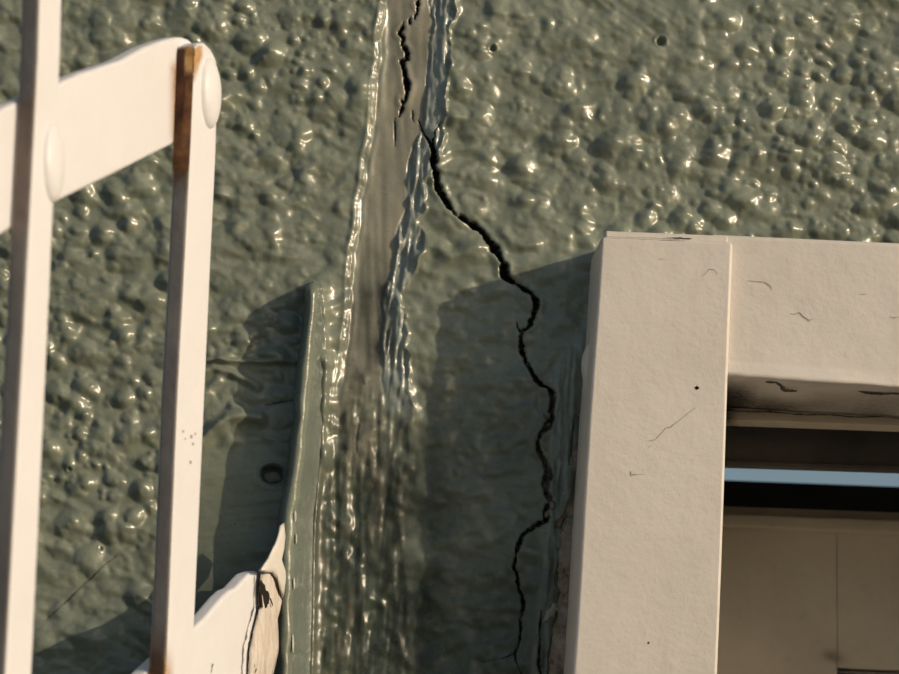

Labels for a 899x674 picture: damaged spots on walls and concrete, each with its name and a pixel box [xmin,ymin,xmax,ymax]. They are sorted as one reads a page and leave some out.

rust [172,45,202,178]
crack [394,0,556,674]
peeling [248,523,286,674]
peeling [542,414,580,674]